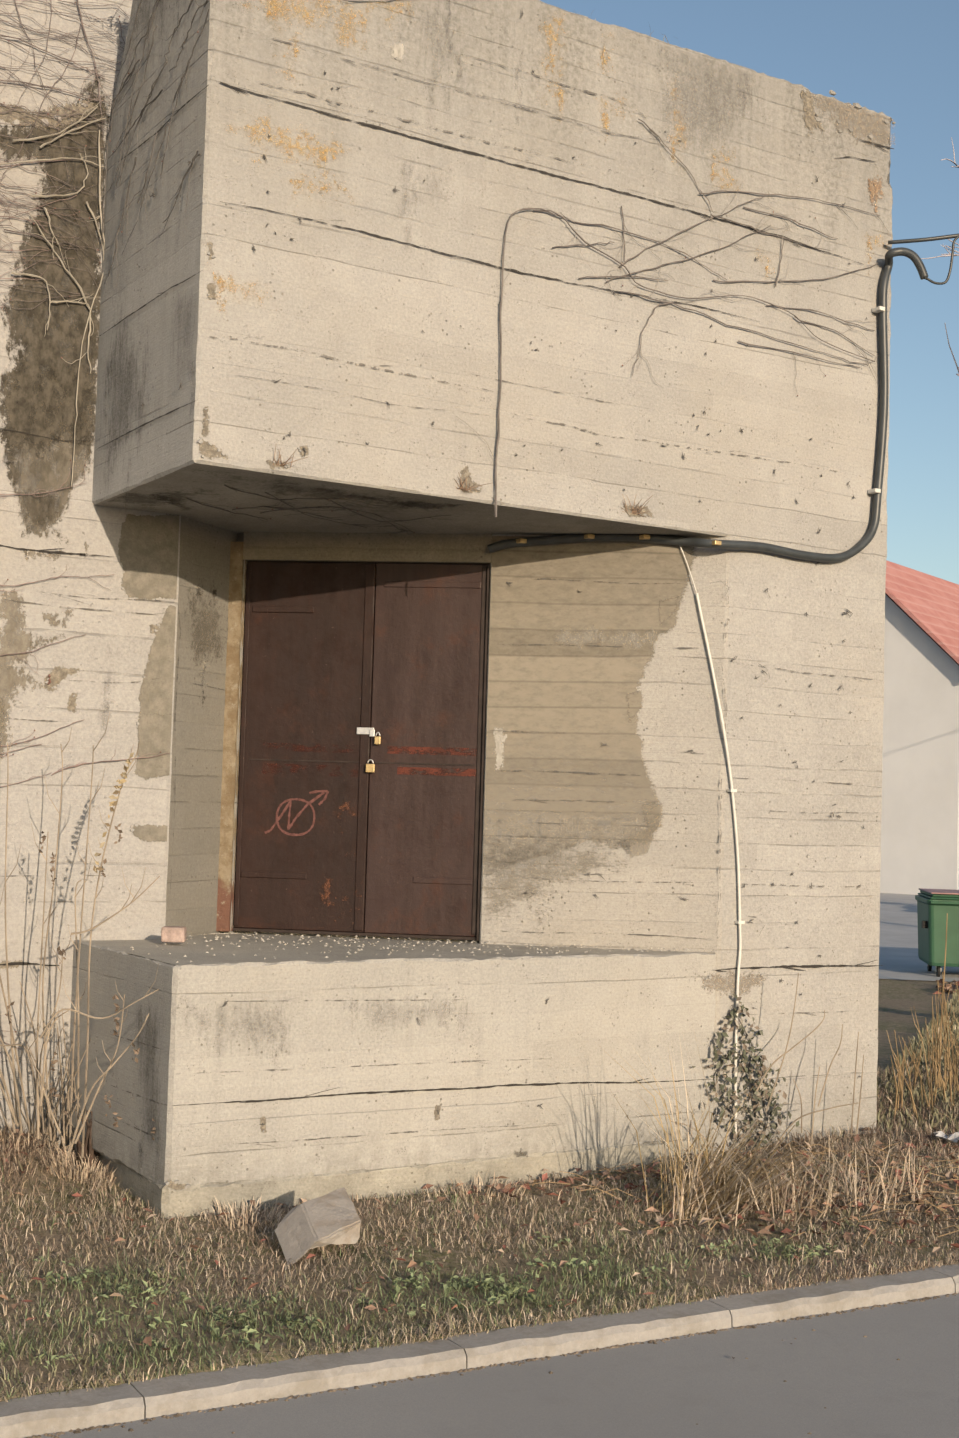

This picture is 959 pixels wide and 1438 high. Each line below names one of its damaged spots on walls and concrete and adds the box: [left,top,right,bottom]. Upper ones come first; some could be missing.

spalling [0,100,96,129]
spalling [800,89,896,148]
peeling [118,513,180,780]